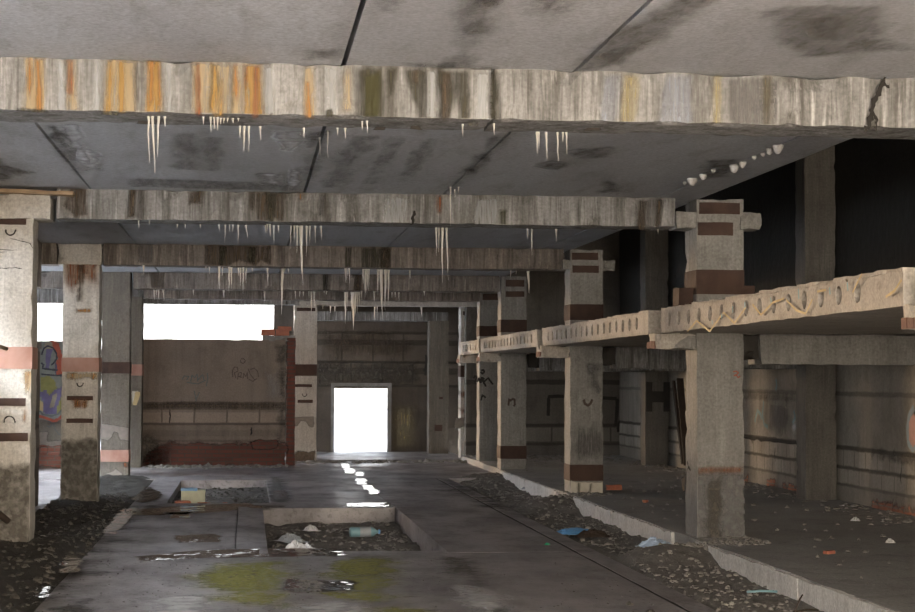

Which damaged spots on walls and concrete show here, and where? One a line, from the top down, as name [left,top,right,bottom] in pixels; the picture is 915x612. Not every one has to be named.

rust [25,57,44,110]
rust [66,62,77,110]
rust [106,60,134,112]
rust [146,61,160,112]
rust [193,63,263,116]
water stain [359,67,397,117]
water stain [408,62,498,120]
crack [864,77,890,132]
water stain [205,245,271,266]
water stain [345,248,390,291]